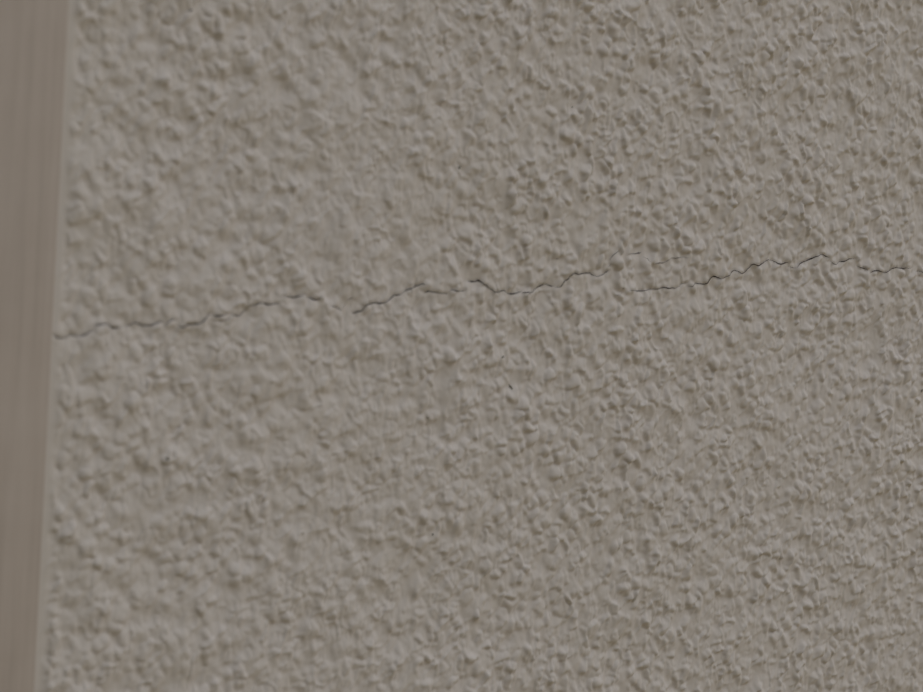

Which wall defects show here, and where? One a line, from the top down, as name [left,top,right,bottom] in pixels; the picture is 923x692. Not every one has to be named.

crack [54,250,686,339]
crack [622,254,922,291]